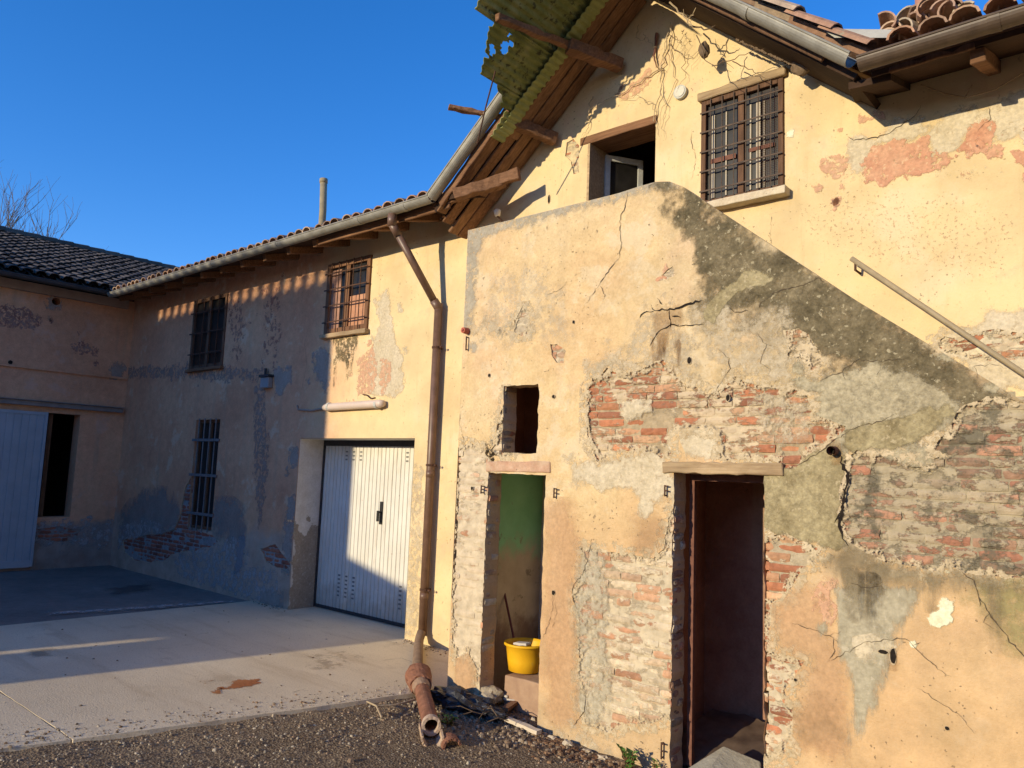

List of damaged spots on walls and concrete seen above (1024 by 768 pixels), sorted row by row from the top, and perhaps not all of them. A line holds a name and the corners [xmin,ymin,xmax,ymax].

flaking render [807,90,1024,275]
flaking render [346,289,407,401]
crack [550,195,628,306]
crack [640,298,701,345]
water stain [650,181,1007,405]
spalling [124,479,217,562]
peeling [261,515,318,610]
spalling [539,325,1024,768]
crack [784,416,891,545]
crack [798,624,949,676]
water stain [818,543,1024,741]